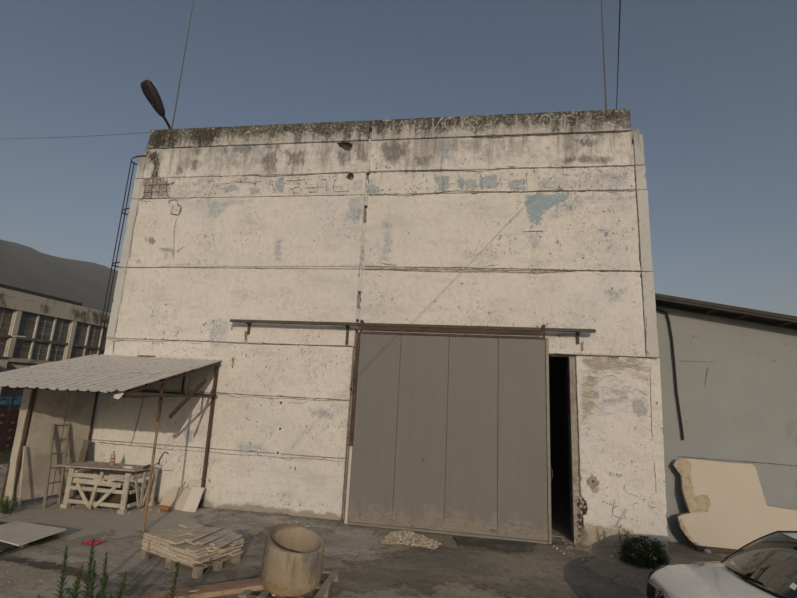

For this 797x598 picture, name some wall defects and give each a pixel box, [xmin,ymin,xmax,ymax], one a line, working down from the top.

water stain [143,129,178,198]
water stain [190,127,221,167]
water stain [263,126,304,168]
peeling [598,376,658,416]